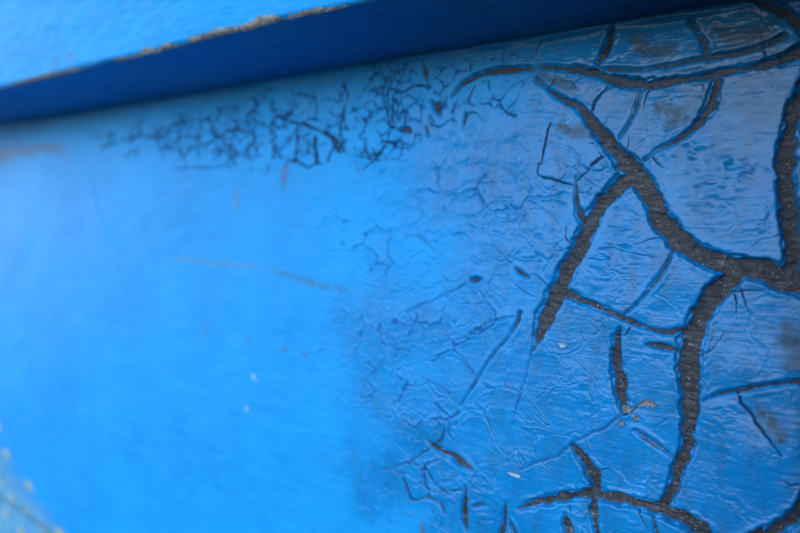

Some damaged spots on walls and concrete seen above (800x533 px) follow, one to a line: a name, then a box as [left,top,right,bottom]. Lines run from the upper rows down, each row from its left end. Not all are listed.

peeling [104,2,365,63]
crack [752,0,800,32]
peeling [2,66,91,89]
crack [90,60,431,175]
crack [334,209,404,278]
crack [416,23,800,533]
crack [337,278,522,531]